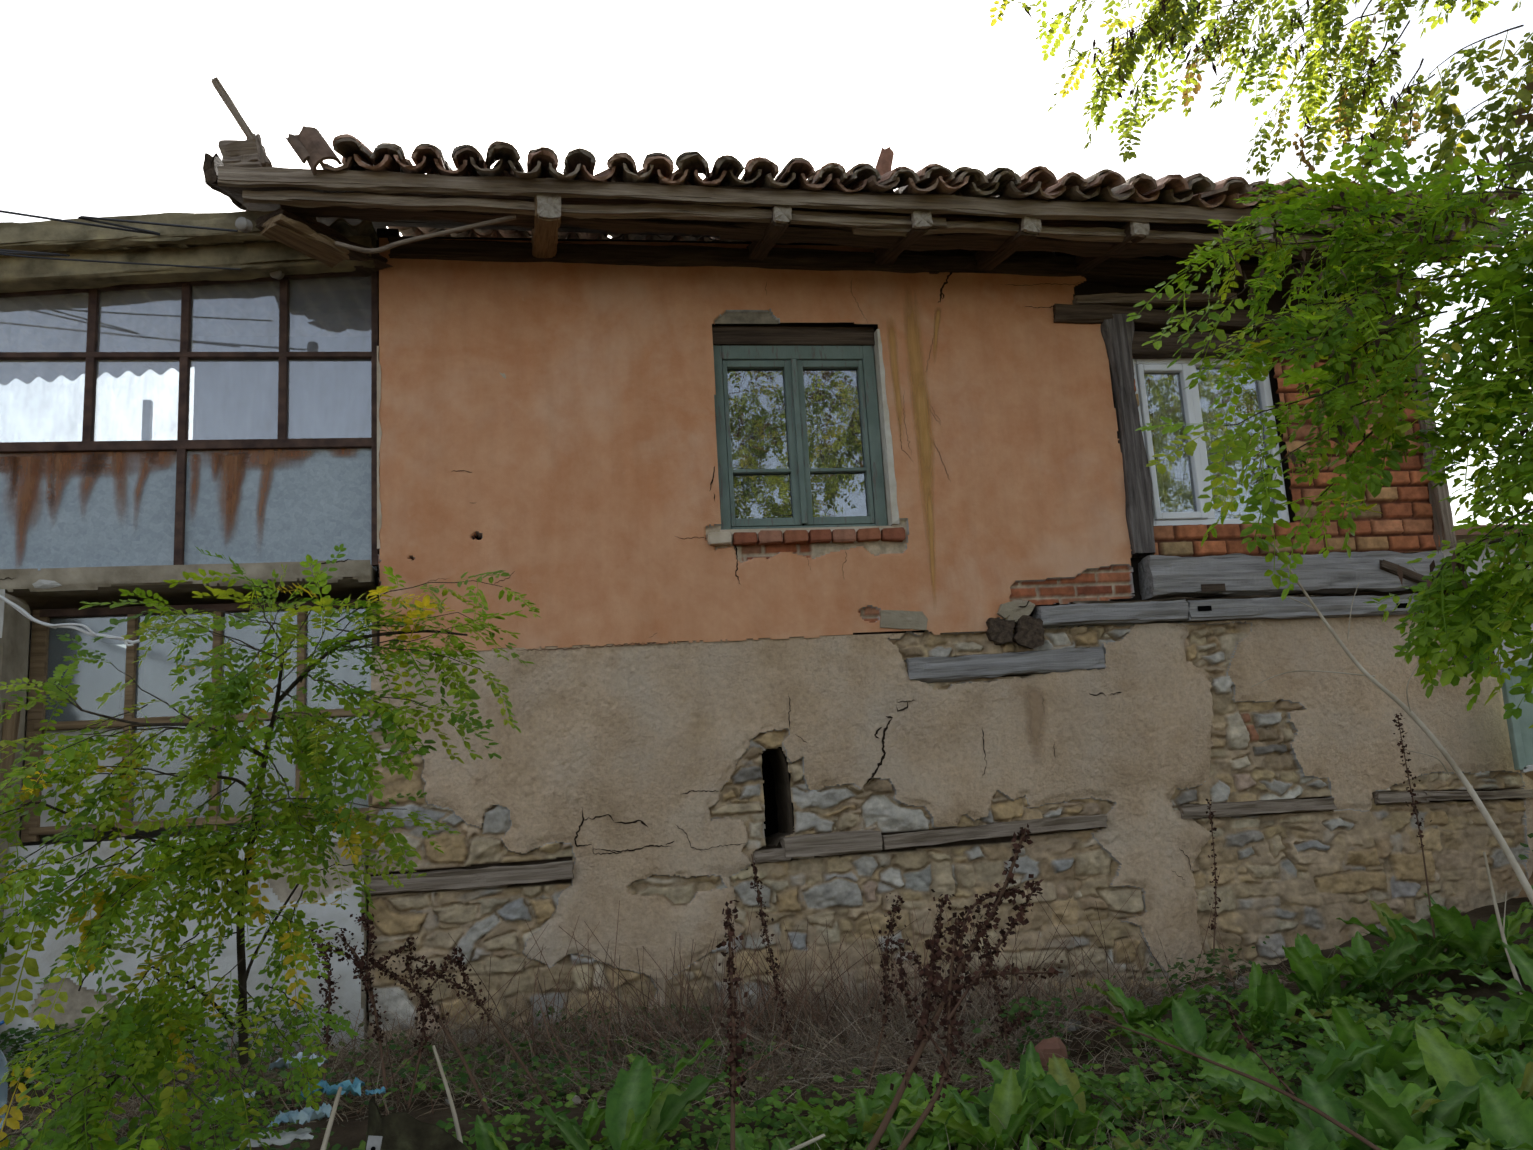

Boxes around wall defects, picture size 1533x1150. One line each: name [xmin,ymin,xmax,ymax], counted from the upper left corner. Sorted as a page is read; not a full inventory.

rust [0,452,172,554]
rust [191,449,312,524]
spalling [705,329,909,563]
damp [889,310,940,588]
spalling [858,605,881,623]
spalling [927,673,1049,690]
spalling [888,617,1134,670]
spalling [1009,564,1135,605]
crack [865,699,914,785]
crack [574,790,744,855]
spalling [1170,621,1531,975]
spalling [265,704,1177,1049]